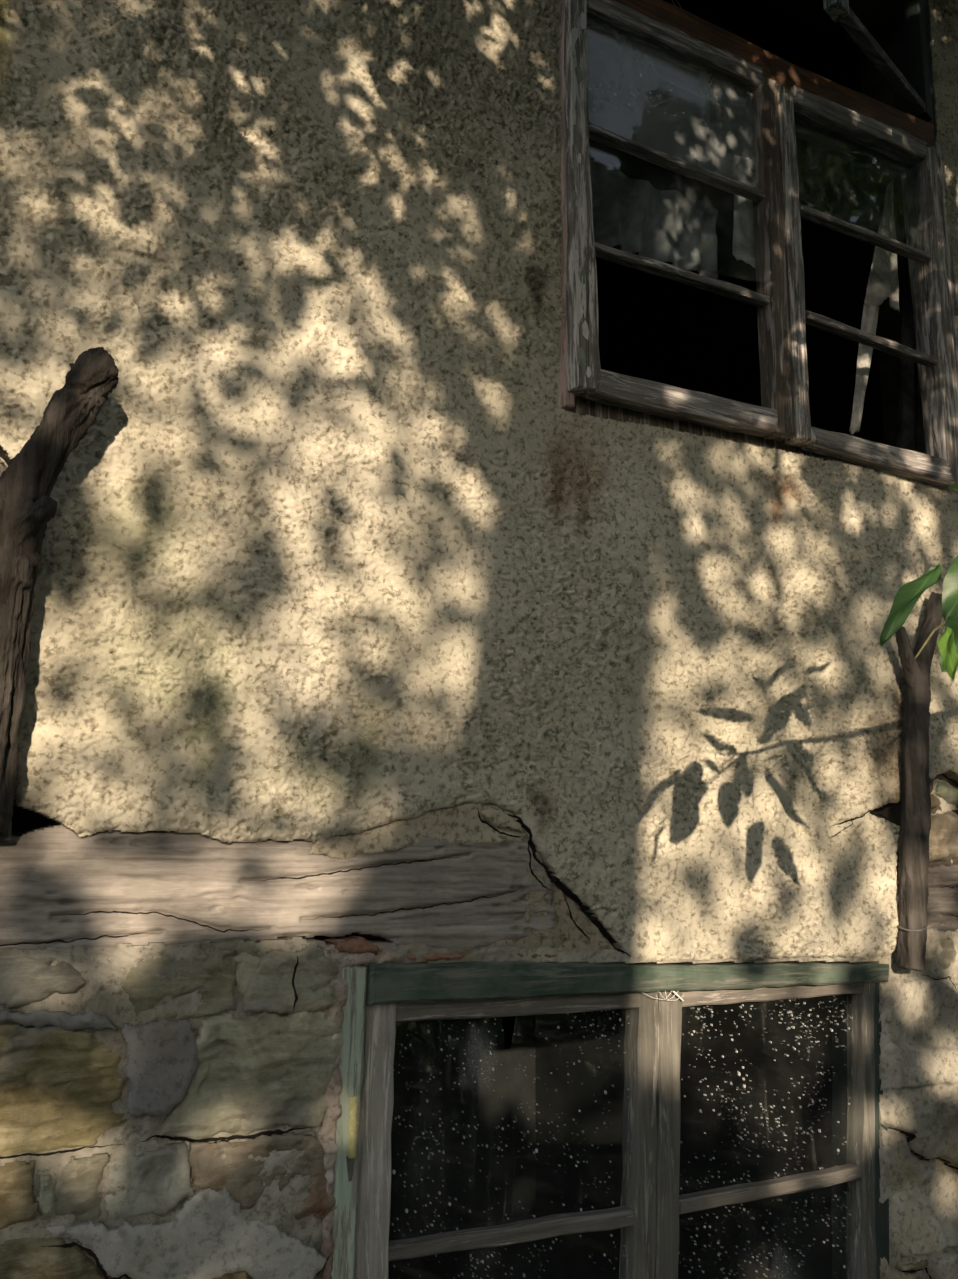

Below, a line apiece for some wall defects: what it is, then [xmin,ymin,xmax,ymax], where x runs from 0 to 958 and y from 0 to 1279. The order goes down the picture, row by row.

spalling [929,779,958,863]
crack [248,855,465,881]
crack [301,808,632,957]